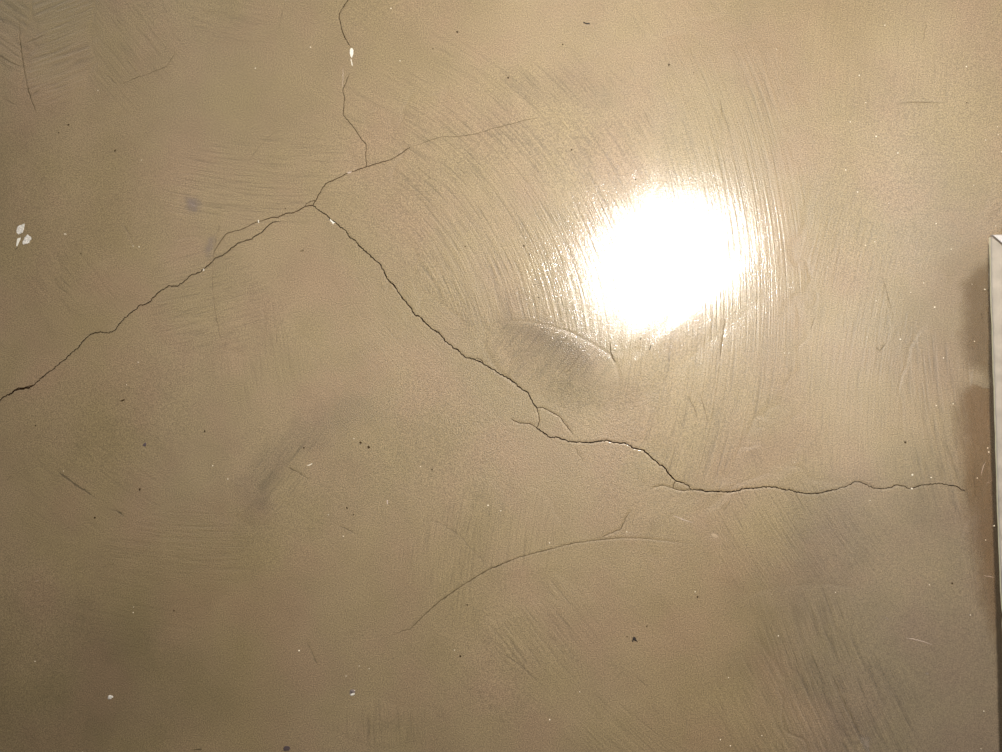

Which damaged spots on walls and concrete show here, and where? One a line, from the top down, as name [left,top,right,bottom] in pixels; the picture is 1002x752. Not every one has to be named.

crack [0,76,989,494]